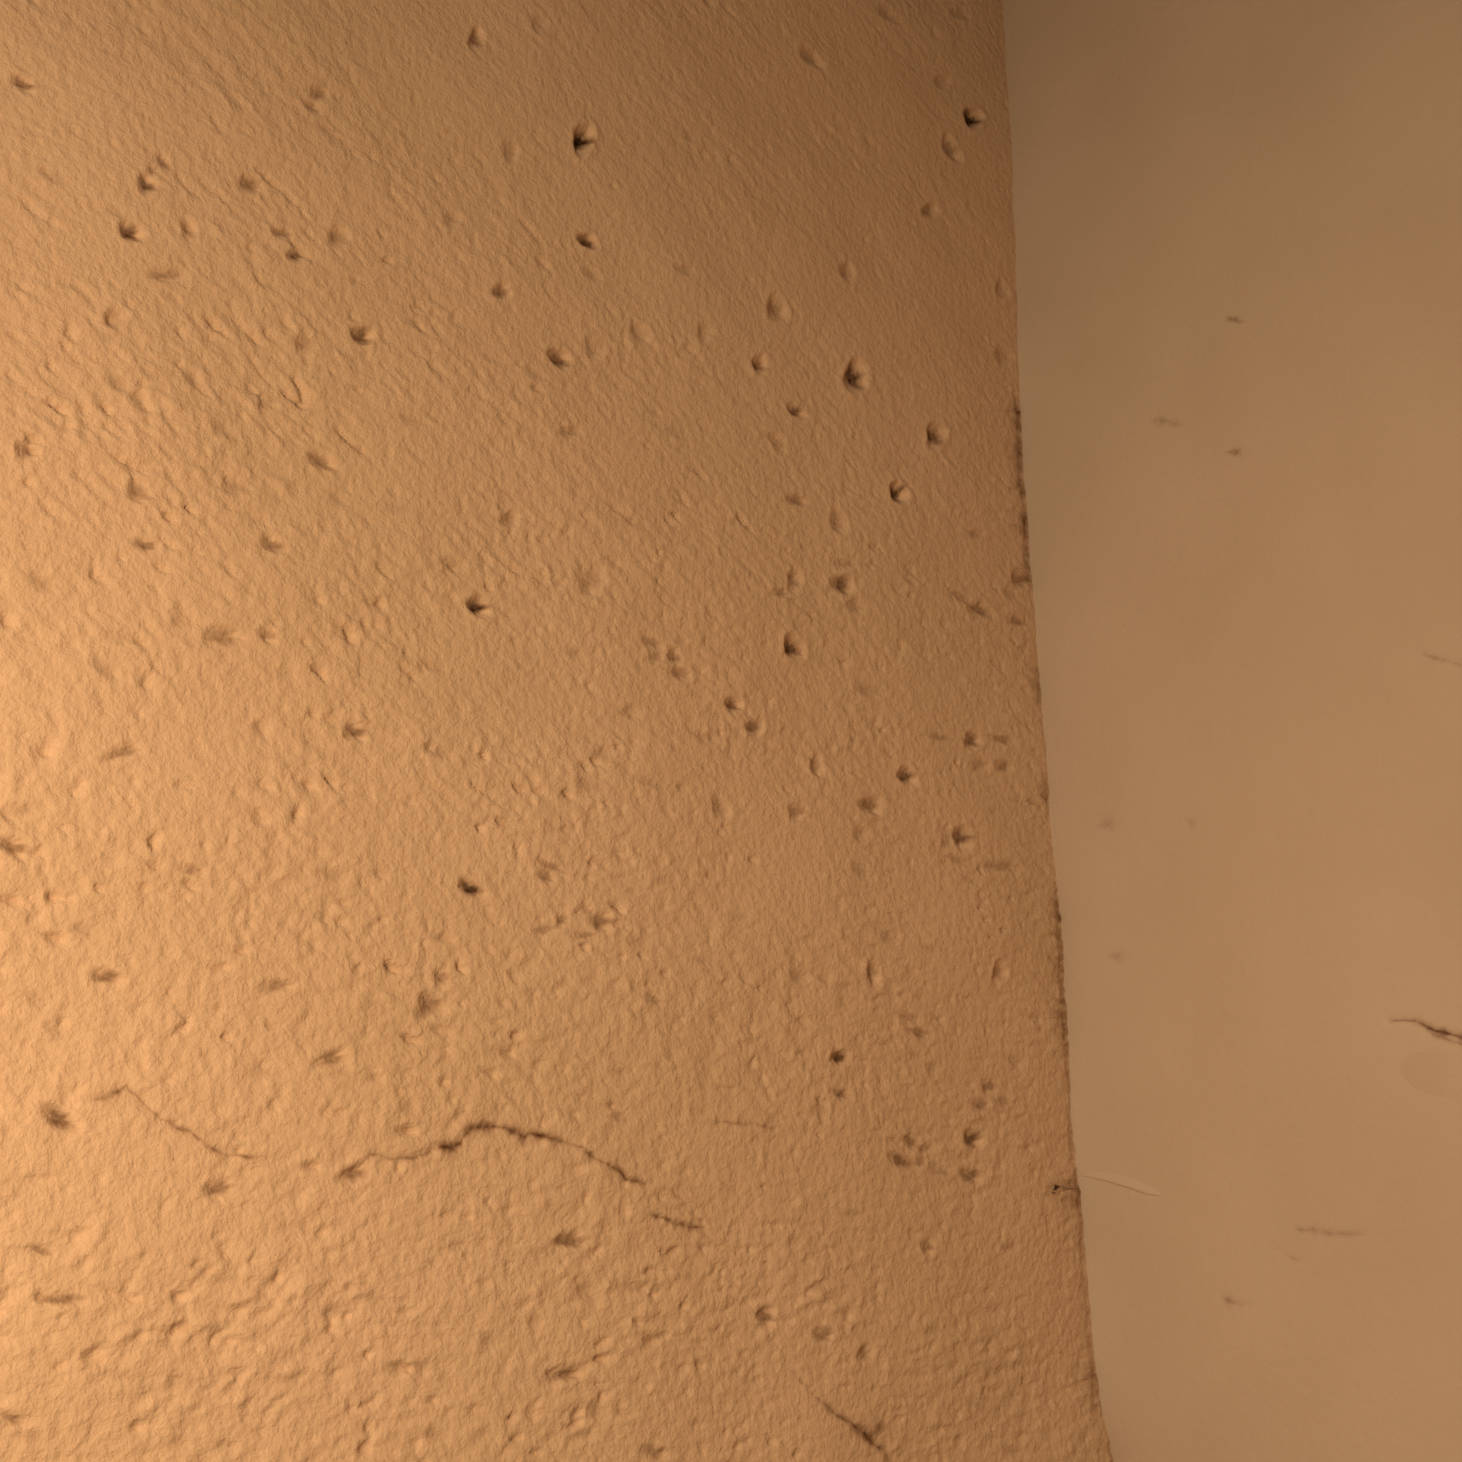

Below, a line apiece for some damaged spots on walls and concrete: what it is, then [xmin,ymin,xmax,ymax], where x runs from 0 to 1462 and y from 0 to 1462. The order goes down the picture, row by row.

crack [1421,1023,1461,1038]
crack [415,1123,555,1158]
crack [832,1411,880,1449]